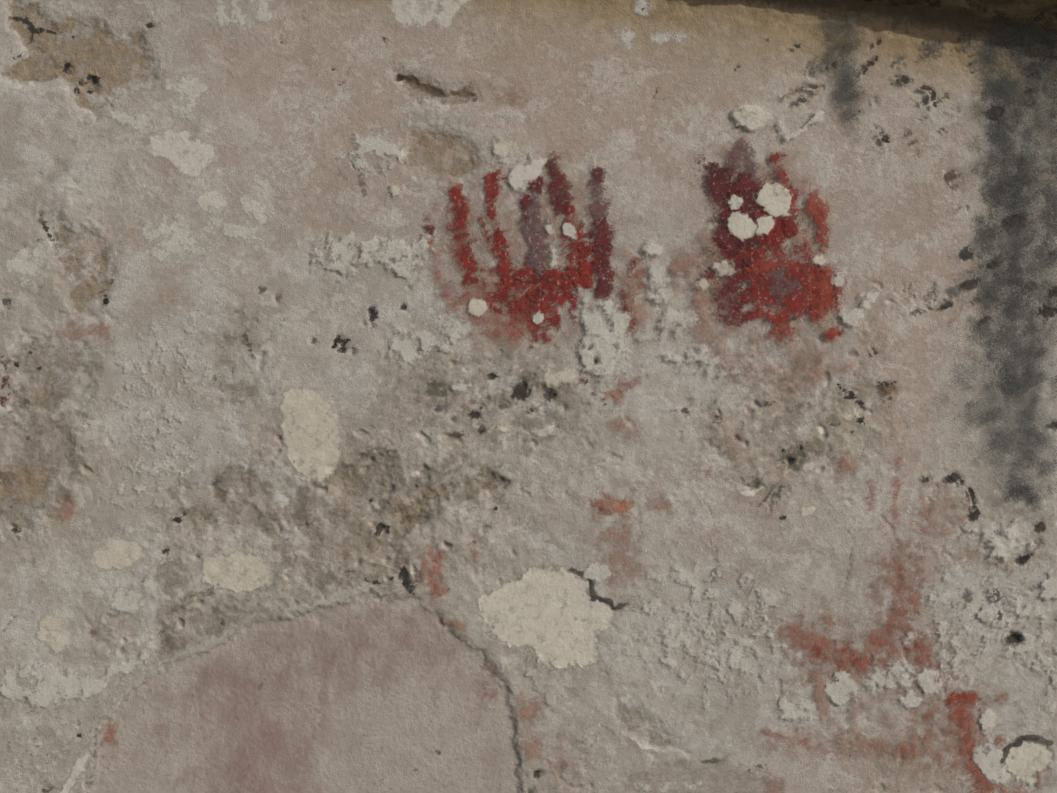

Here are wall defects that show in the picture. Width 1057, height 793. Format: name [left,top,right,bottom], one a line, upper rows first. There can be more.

spalling [7,2,162,124]
spalling [390,64,492,196]
damp [785,17,882,132]
damp [908,11,1057,566]
spalling [77,451,531,793]
peeling [474,561,630,669]